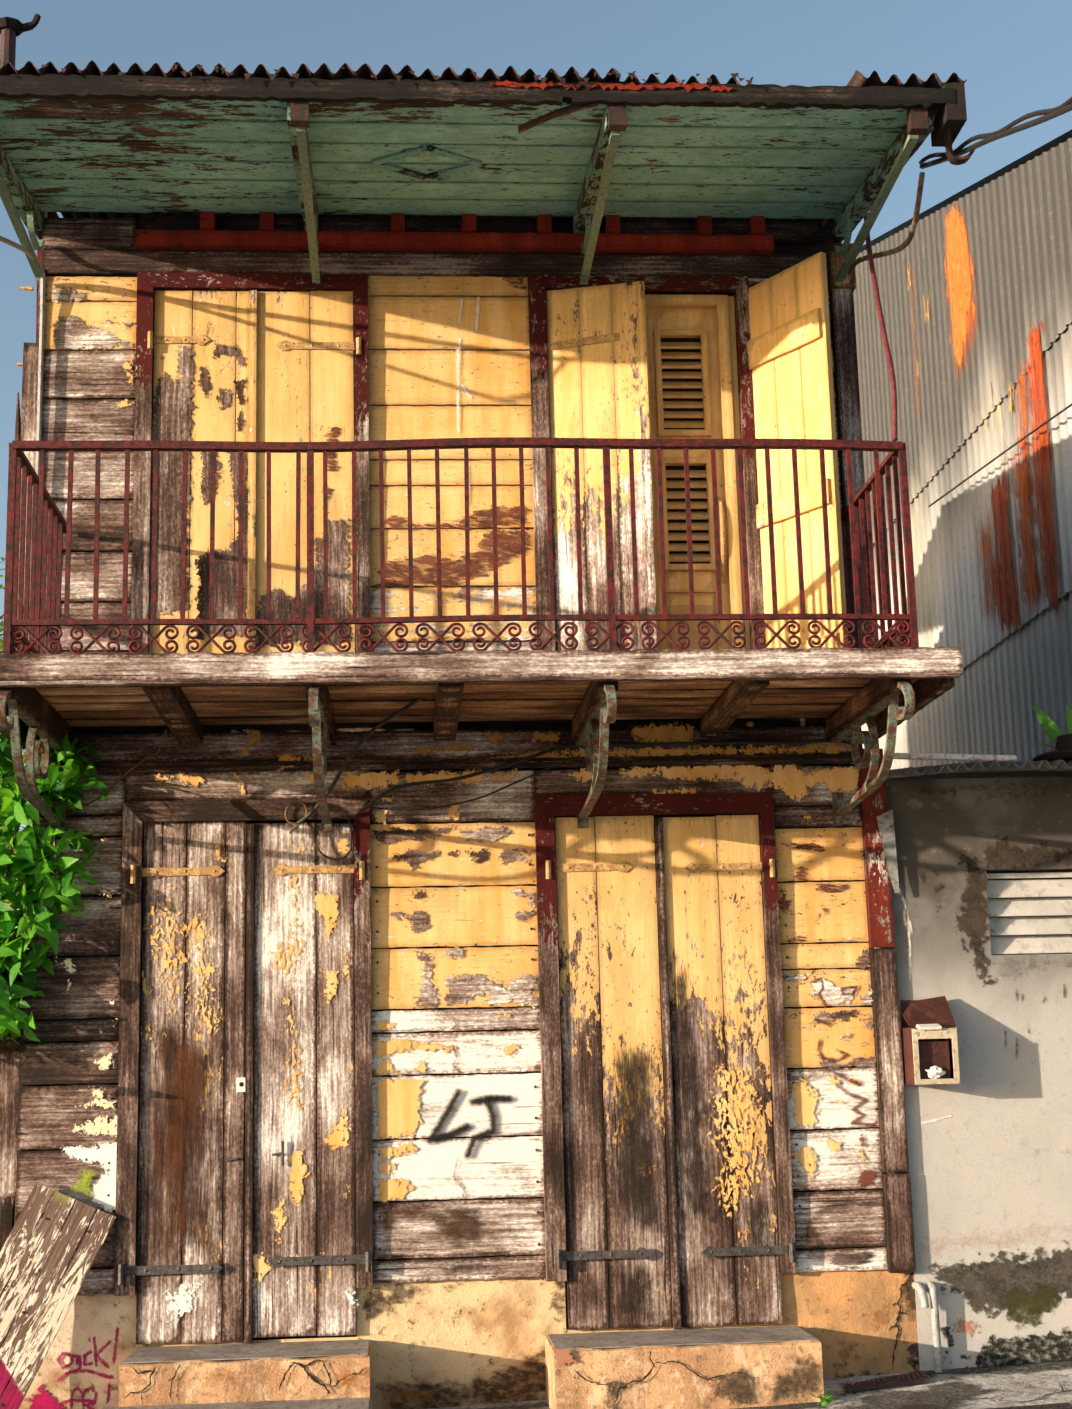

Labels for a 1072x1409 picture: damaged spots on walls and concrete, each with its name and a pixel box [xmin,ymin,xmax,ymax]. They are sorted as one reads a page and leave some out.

corrosion [944,204,977,386]
peeling [149,343,353,648]
corrosion [980,321,1061,637]
peeling [278,730,593,871]
peeling [608,722,860,821]
damp [607,1043,659,1229]
damp [670,951,720,1225]
peeling [691,1060,775,1243]
crack [125,1365,181,1404]
crack [279,1360,367,1394]
damp [389,1349,546,1409]
crack [575,1351,763,1406]